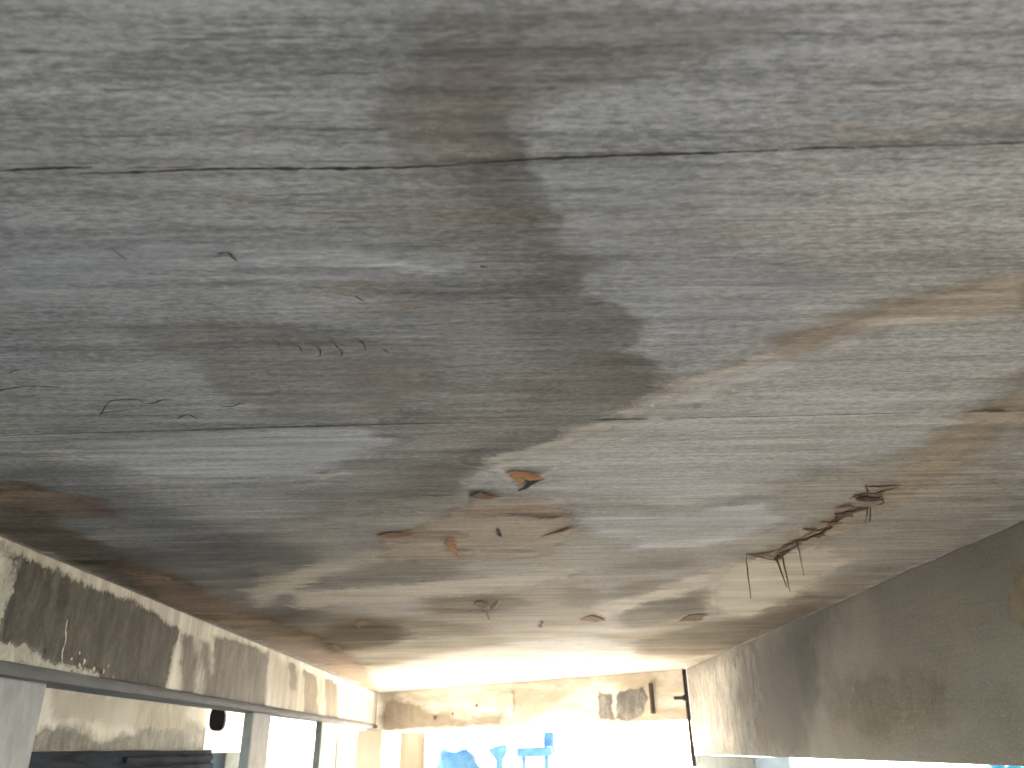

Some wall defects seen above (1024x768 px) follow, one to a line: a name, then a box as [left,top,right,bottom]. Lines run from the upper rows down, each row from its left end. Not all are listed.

crack [0,141,1024,174]
water stain [0,248,468,284]
crack [1,399,481,436]
crack [598,412,920,420]
peeling [509,475,545,491]
water stain [0,276,1024,756]